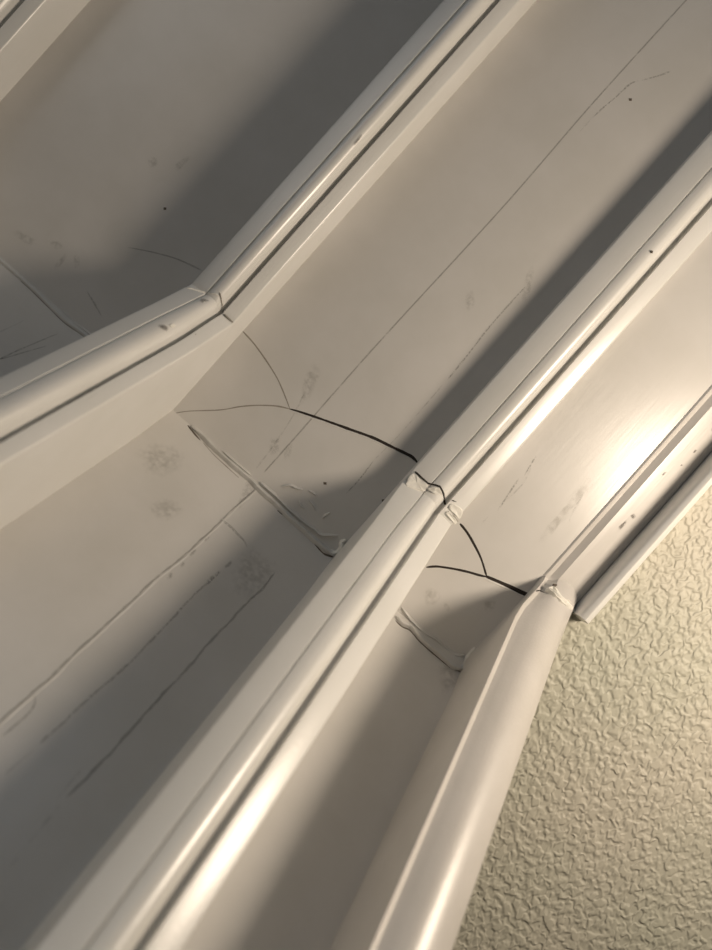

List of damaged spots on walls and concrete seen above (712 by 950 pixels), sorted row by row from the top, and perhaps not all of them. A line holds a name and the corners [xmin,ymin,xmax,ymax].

crack [177,287,545,597]